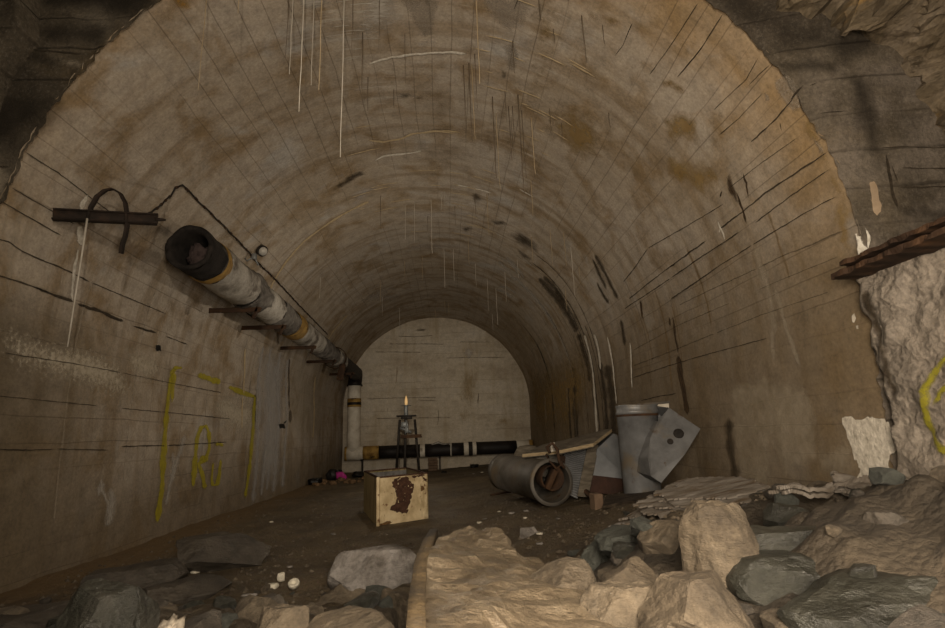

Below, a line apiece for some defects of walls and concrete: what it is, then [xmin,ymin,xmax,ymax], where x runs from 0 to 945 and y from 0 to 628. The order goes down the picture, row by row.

crack [650,5,697,74]
crack [678,16,722,76]
crack [715,60,767,134]
crack [624,83,842,308]
peeling [869,181,882,215]
peeling [618,416,896,521]